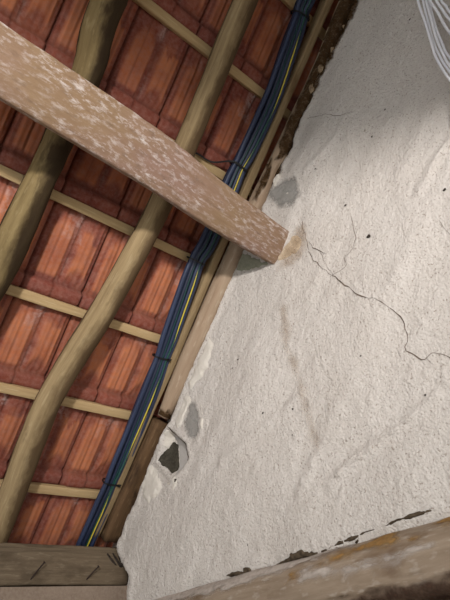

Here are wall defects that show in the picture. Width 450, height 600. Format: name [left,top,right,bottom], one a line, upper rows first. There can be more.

water stain [255,0,358,199]
crack [302,217,450,363]
flaking render [158,395,204,490]
peeling [330,532,397,560]